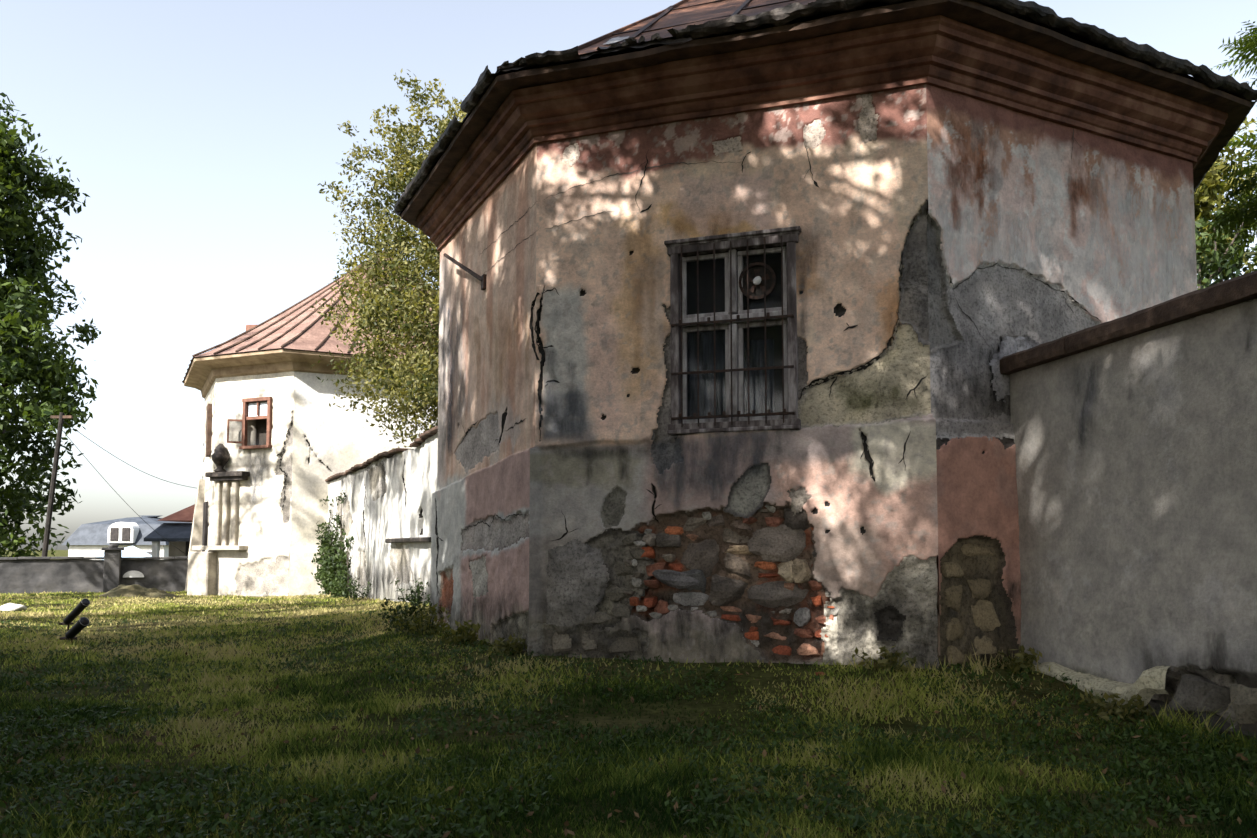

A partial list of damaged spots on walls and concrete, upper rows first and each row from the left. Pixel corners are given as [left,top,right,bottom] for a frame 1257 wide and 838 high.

peeling [561,143,580,167]
peeling [712,136,743,156]
peeling [803,119,826,149]
peeling [858,93,879,144]
crack [480,152,750,273]
spalling [897,200,964,354]
spalling [834,303,846,317]
crack [460,286,560,444]
crack [859,429,911,481]
flaking render [623,501,840,664]
flaking render [938,535,1020,669]